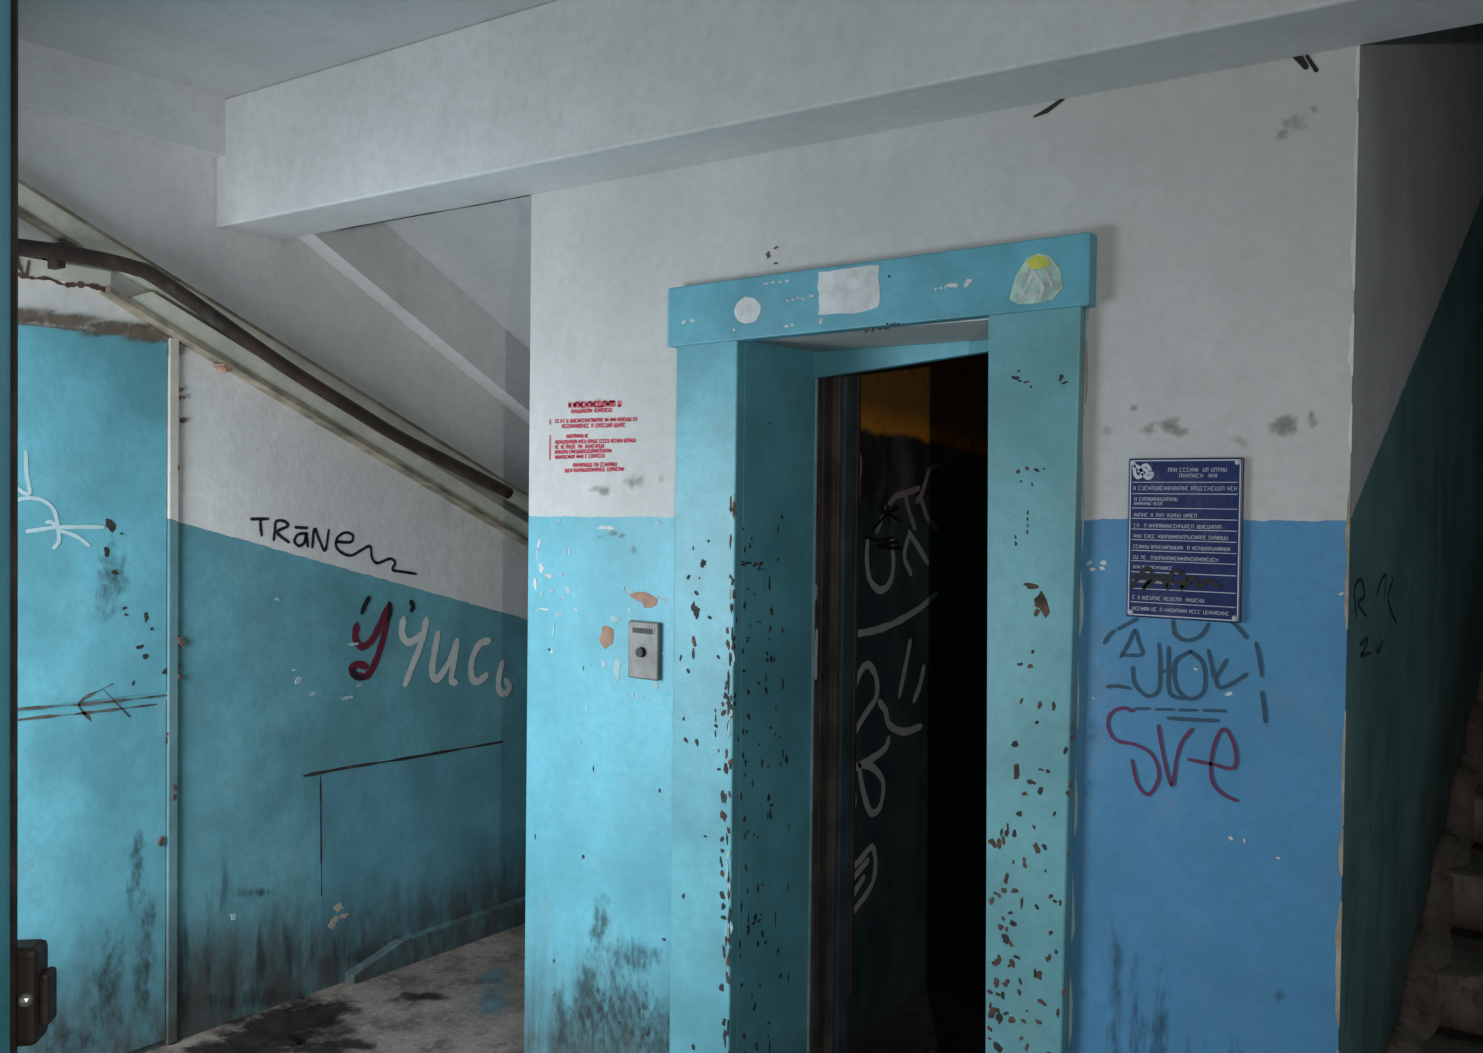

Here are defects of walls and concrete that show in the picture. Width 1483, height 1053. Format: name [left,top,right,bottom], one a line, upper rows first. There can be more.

spalling [18,309,185,355]
peeling [533,539,578,654]
corrosion [988,829,1017,849]
corrosion [987,888,1066,1040]
damp [184,992,373,1053]
damp [394,992,449,1001]
damp [558,974,640,1042]